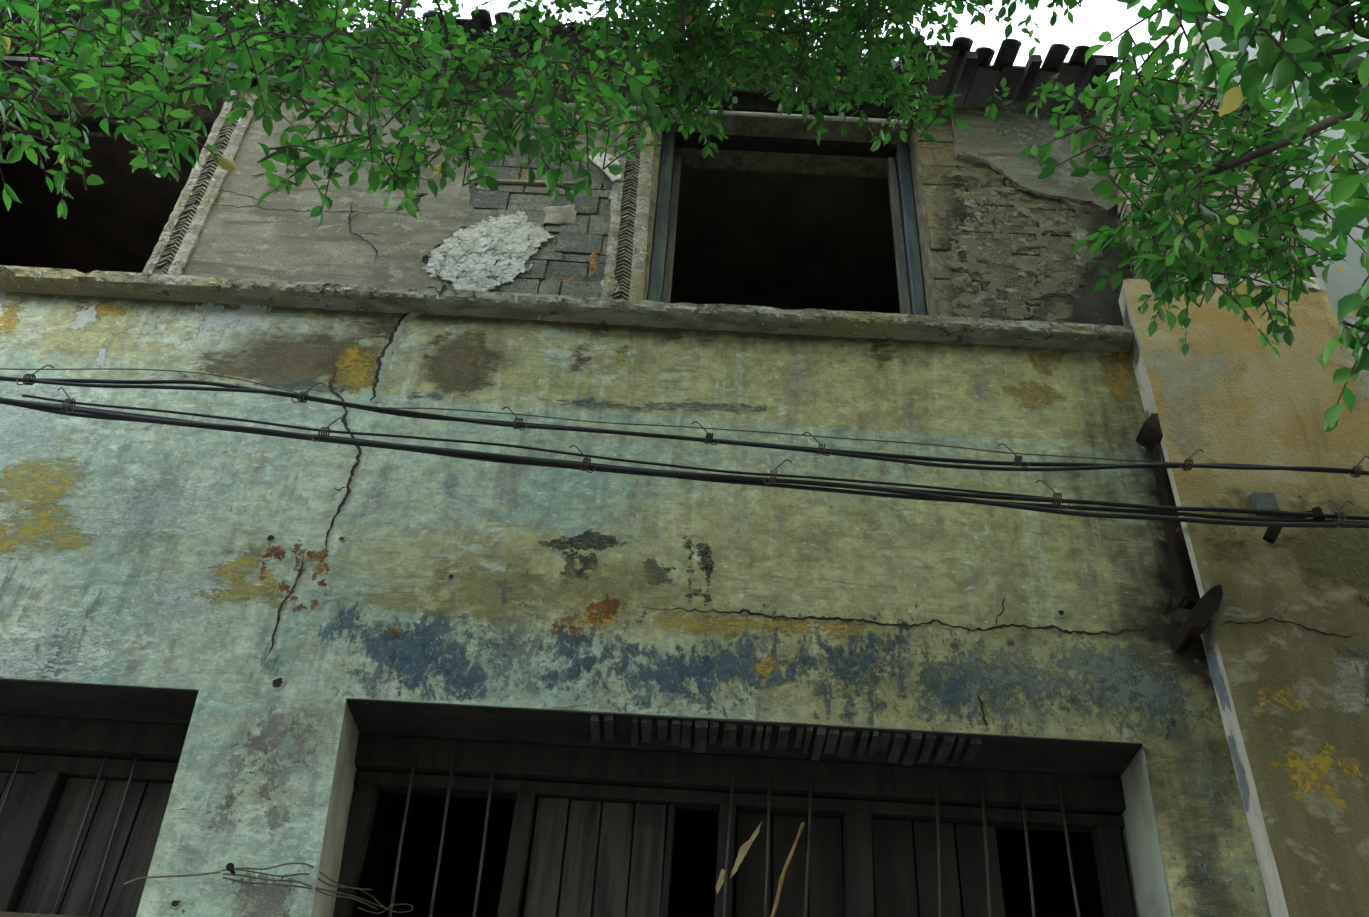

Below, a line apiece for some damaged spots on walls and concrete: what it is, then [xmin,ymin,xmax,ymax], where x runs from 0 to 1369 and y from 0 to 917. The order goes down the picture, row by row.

flaking render [421,142,621,298]
flaking render [939,87,1311,322]
peeling [0,376,83,515]
crack [265,285,447,663]
peeling [0,468,239,683]
crack [643,597,1181,636]
crack [1221,617,1353,638]
peeling [314,573,1255,917]
crack [977,695,987,728]